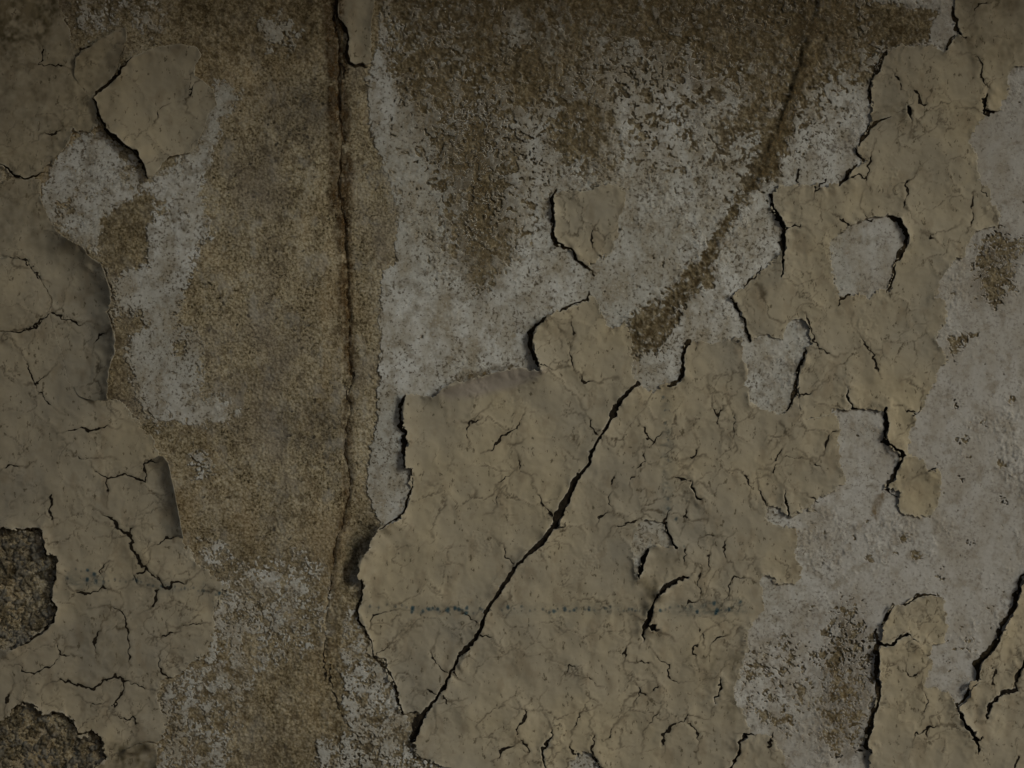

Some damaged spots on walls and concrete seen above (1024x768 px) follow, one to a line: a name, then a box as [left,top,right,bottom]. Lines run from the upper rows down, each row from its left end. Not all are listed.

crack [730,193,801,342]
crack [839,180,933,292]
crack [13,494,200,725]
peeling [0,0,229,768]
crack [78,456,184,607]
crack [323,0,368,717]
crack [356,381,641,743]
crack [499,710,612,768]
peeling [354,0,1024,768]
crack [786,315,830,411]
crack [880,405,921,497]
crack [955,574,1024,753]